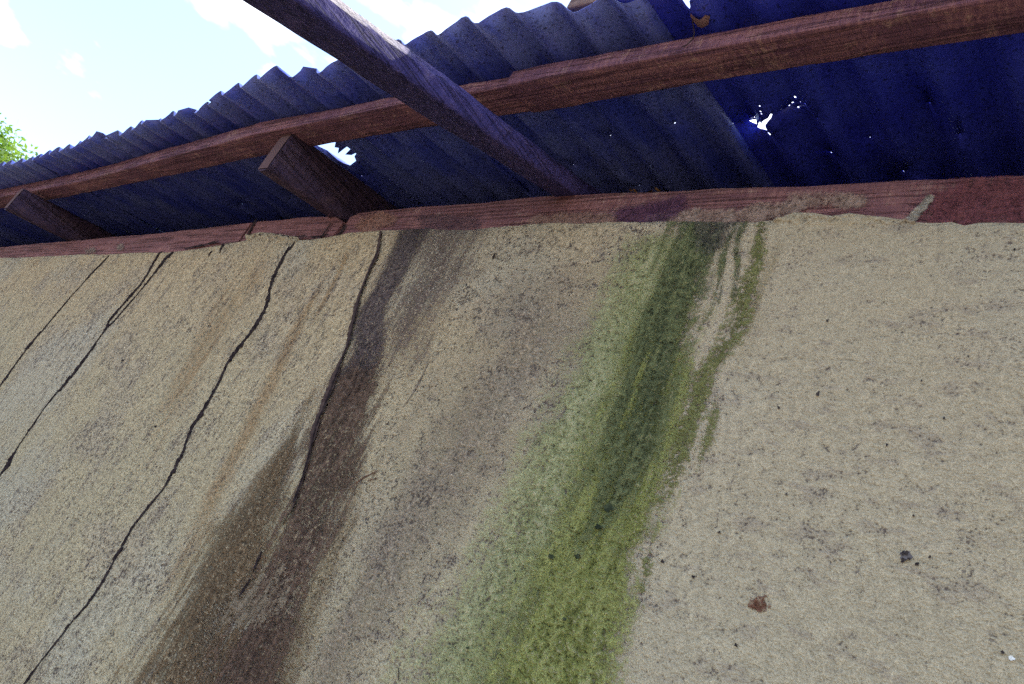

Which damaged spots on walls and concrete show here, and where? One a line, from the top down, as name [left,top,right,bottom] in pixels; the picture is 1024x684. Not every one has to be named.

crack [0,219,346,684]
leakage [111,228,490,684]
crack [280,230,381,524]
leakage [480,195,768,684]